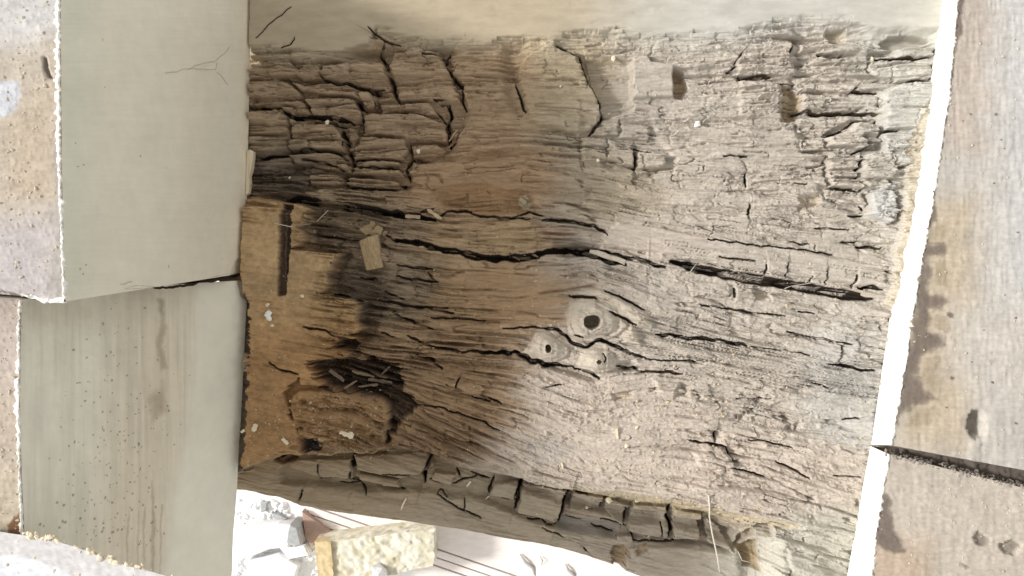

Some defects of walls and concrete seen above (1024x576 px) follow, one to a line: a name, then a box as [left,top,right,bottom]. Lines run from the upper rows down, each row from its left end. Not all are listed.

water stain [954,0,964,53]
crack [260,28,467,192]
crack [556,46,602,137]
crack [447,210,608,235]
crack [320,234,875,431]
water stain [898,244,953,414]
crack [299,452,367,499]
crack [389,454,675,551]